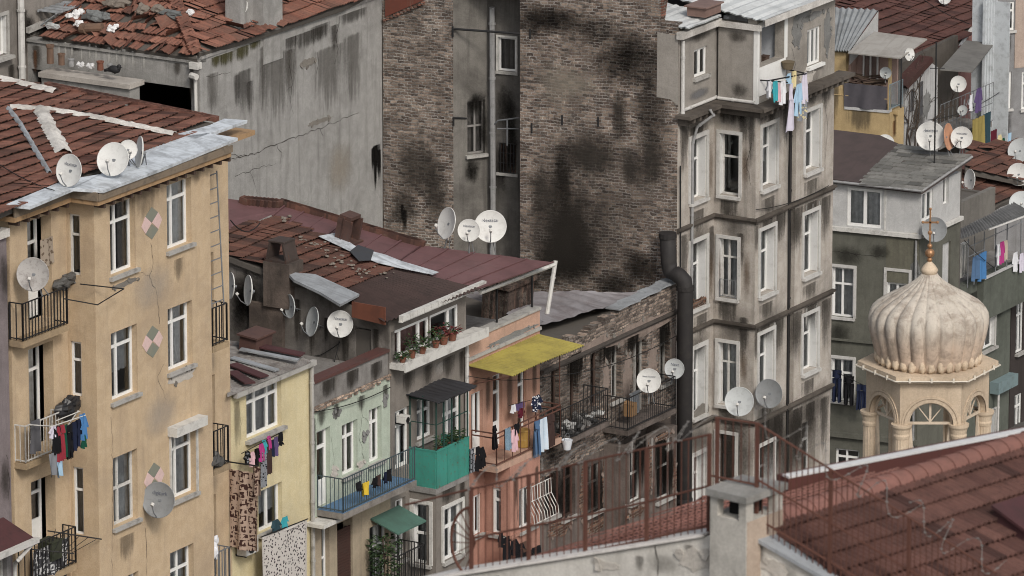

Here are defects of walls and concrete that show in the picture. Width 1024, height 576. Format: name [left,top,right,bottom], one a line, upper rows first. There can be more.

damp [286,9,362,48]
crack [231,113,357,184]
damp [372,148,381,185]
damp [466,161,478,179]
damp [497,119,516,184]
damp [534,139,612,212]
damp [721,107,788,148]
damp [529,223,594,288]
damp [600,256,654,293]
damp [694,209,720,271]
damp [721,200,736,215]
damp [738,197,830,279]